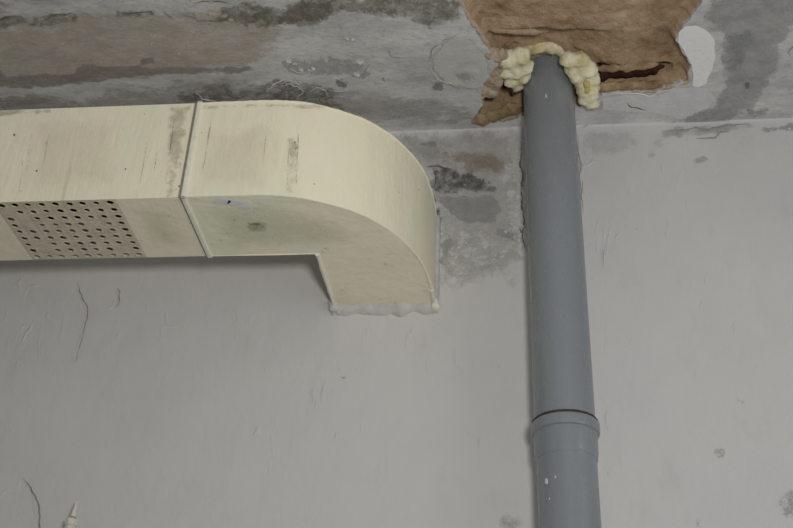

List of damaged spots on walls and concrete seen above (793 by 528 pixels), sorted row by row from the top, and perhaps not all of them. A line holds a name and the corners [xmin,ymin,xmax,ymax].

damp [215,0,459,27]
damp [0,58,471,124]
peeling [282,54,370,88]
spalling [458,0,543,100]
spalling [598,61,659,73]
damp [668,0,793,139]
damp [427,165,491,215]
crack [74,283,88,363]
crack [25,482,43,528]